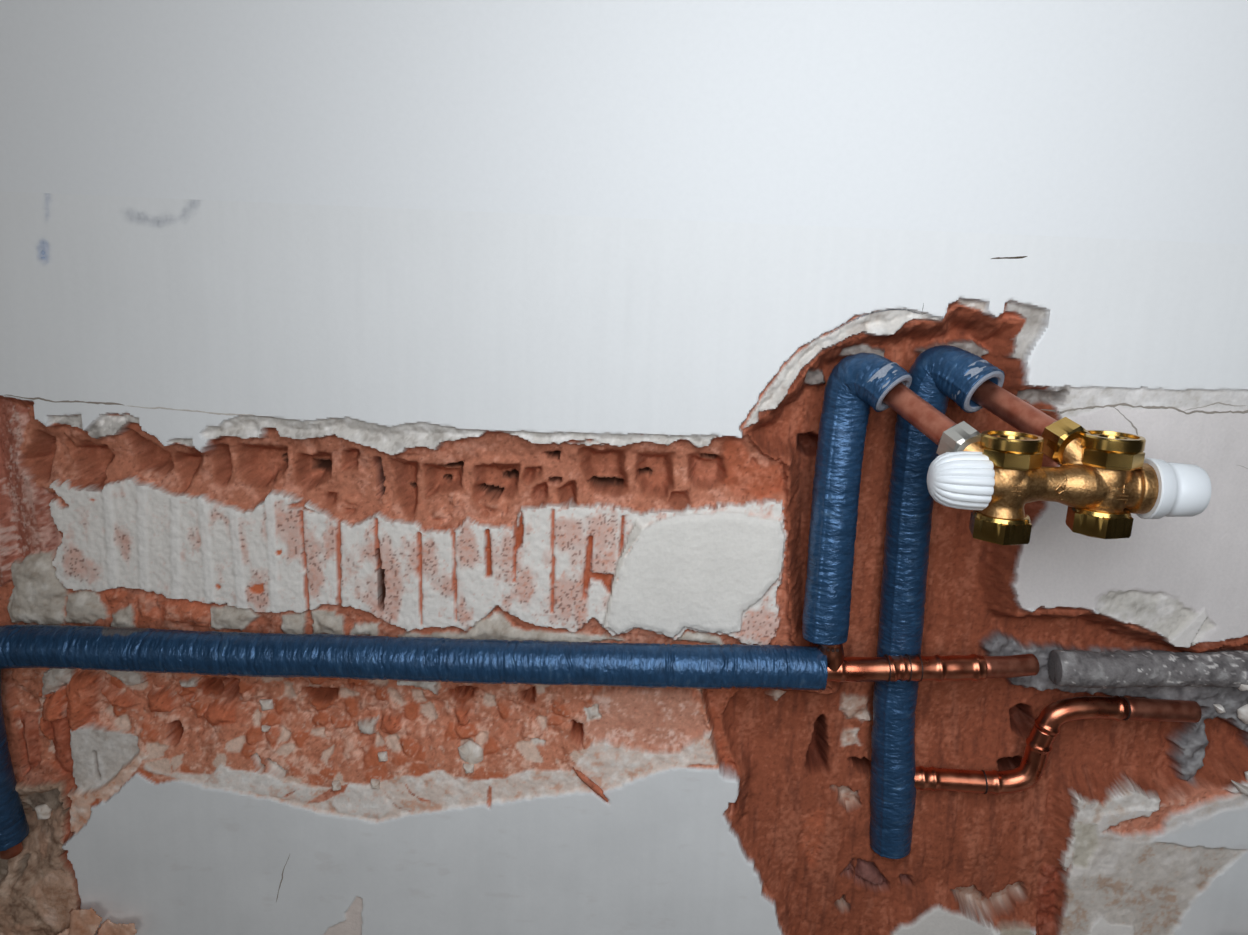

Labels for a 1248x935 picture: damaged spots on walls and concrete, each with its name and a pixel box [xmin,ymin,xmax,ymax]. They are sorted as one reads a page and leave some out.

flaking render [0,298,1050,646]
flaking render [1014,385,1248,650]
flaking render [0,668,719,935]
flaking render [722,800,737,827]
flaking render [894,908,1038,935]
flaking render [1061,781,1248,935]